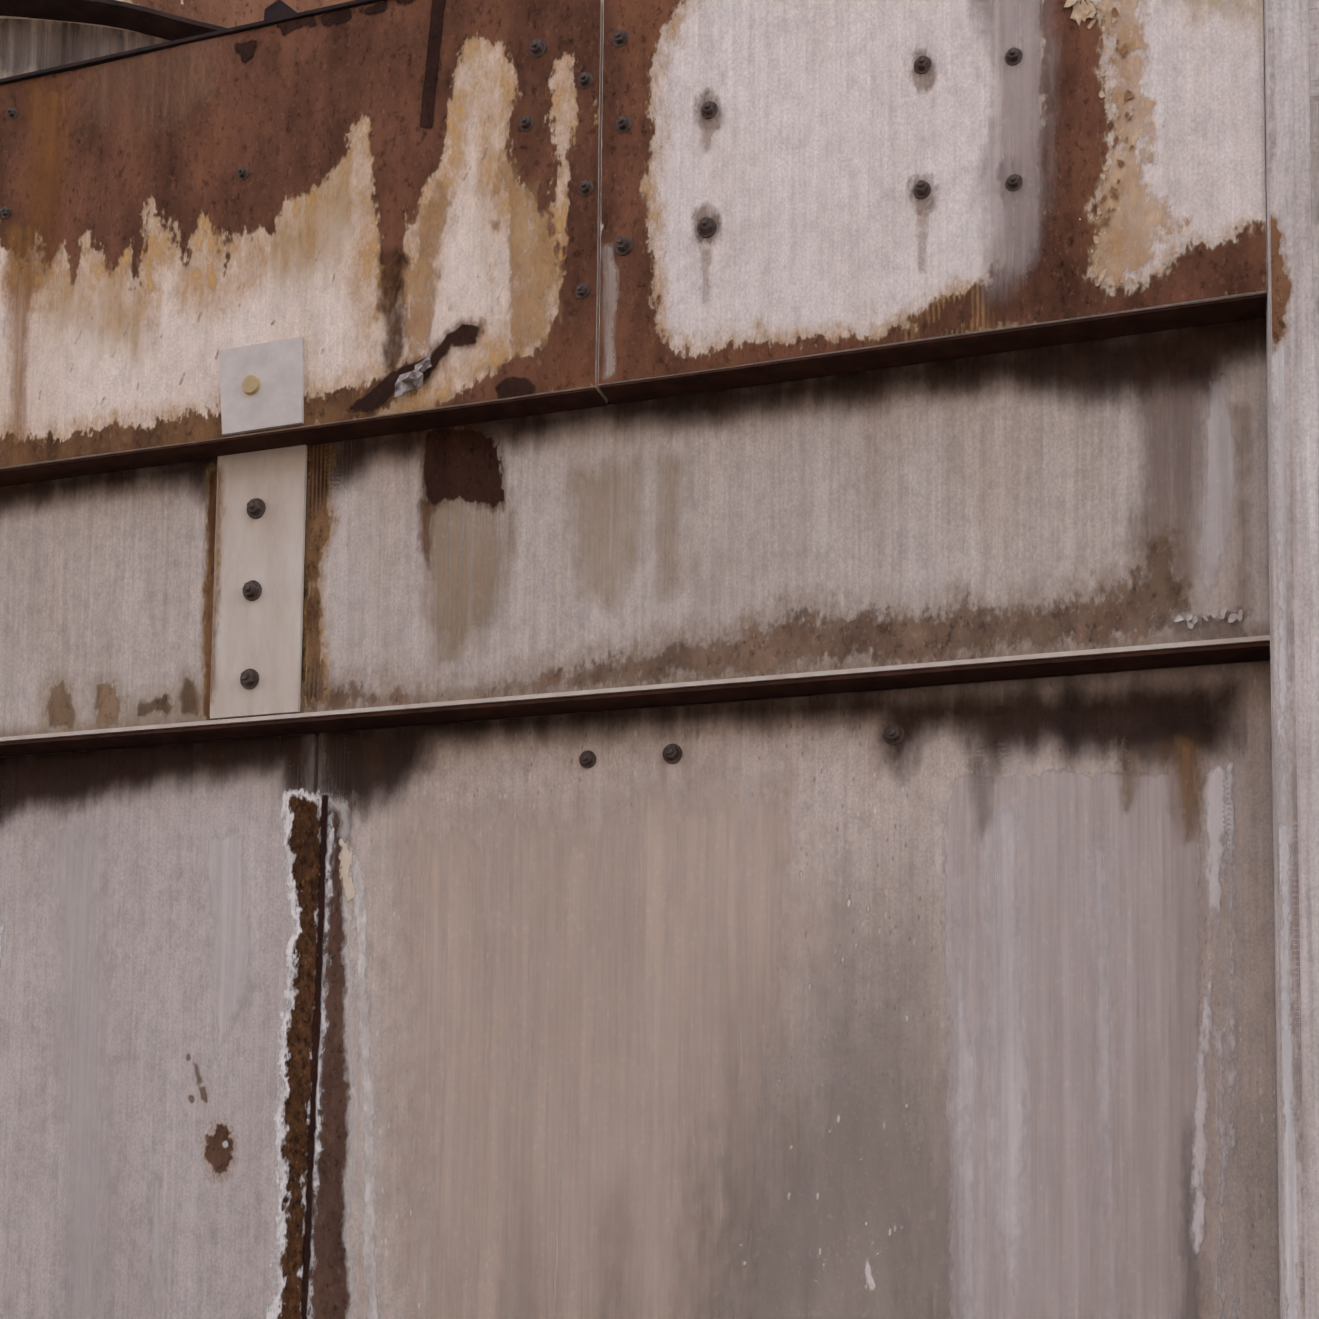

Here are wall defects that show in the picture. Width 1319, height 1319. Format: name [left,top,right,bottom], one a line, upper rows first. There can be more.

corrosion [0,0,1292,718]
peeling [1064,0,1189,291]
water stain [1141,375,1236,592]
water stain [1272,337,1293,743]
water stain [339,838,379,1319]
corrosion [0,680,1236,1319]
water stain [400,762,1238,1319]
water stain [1279,770,1305,1319]